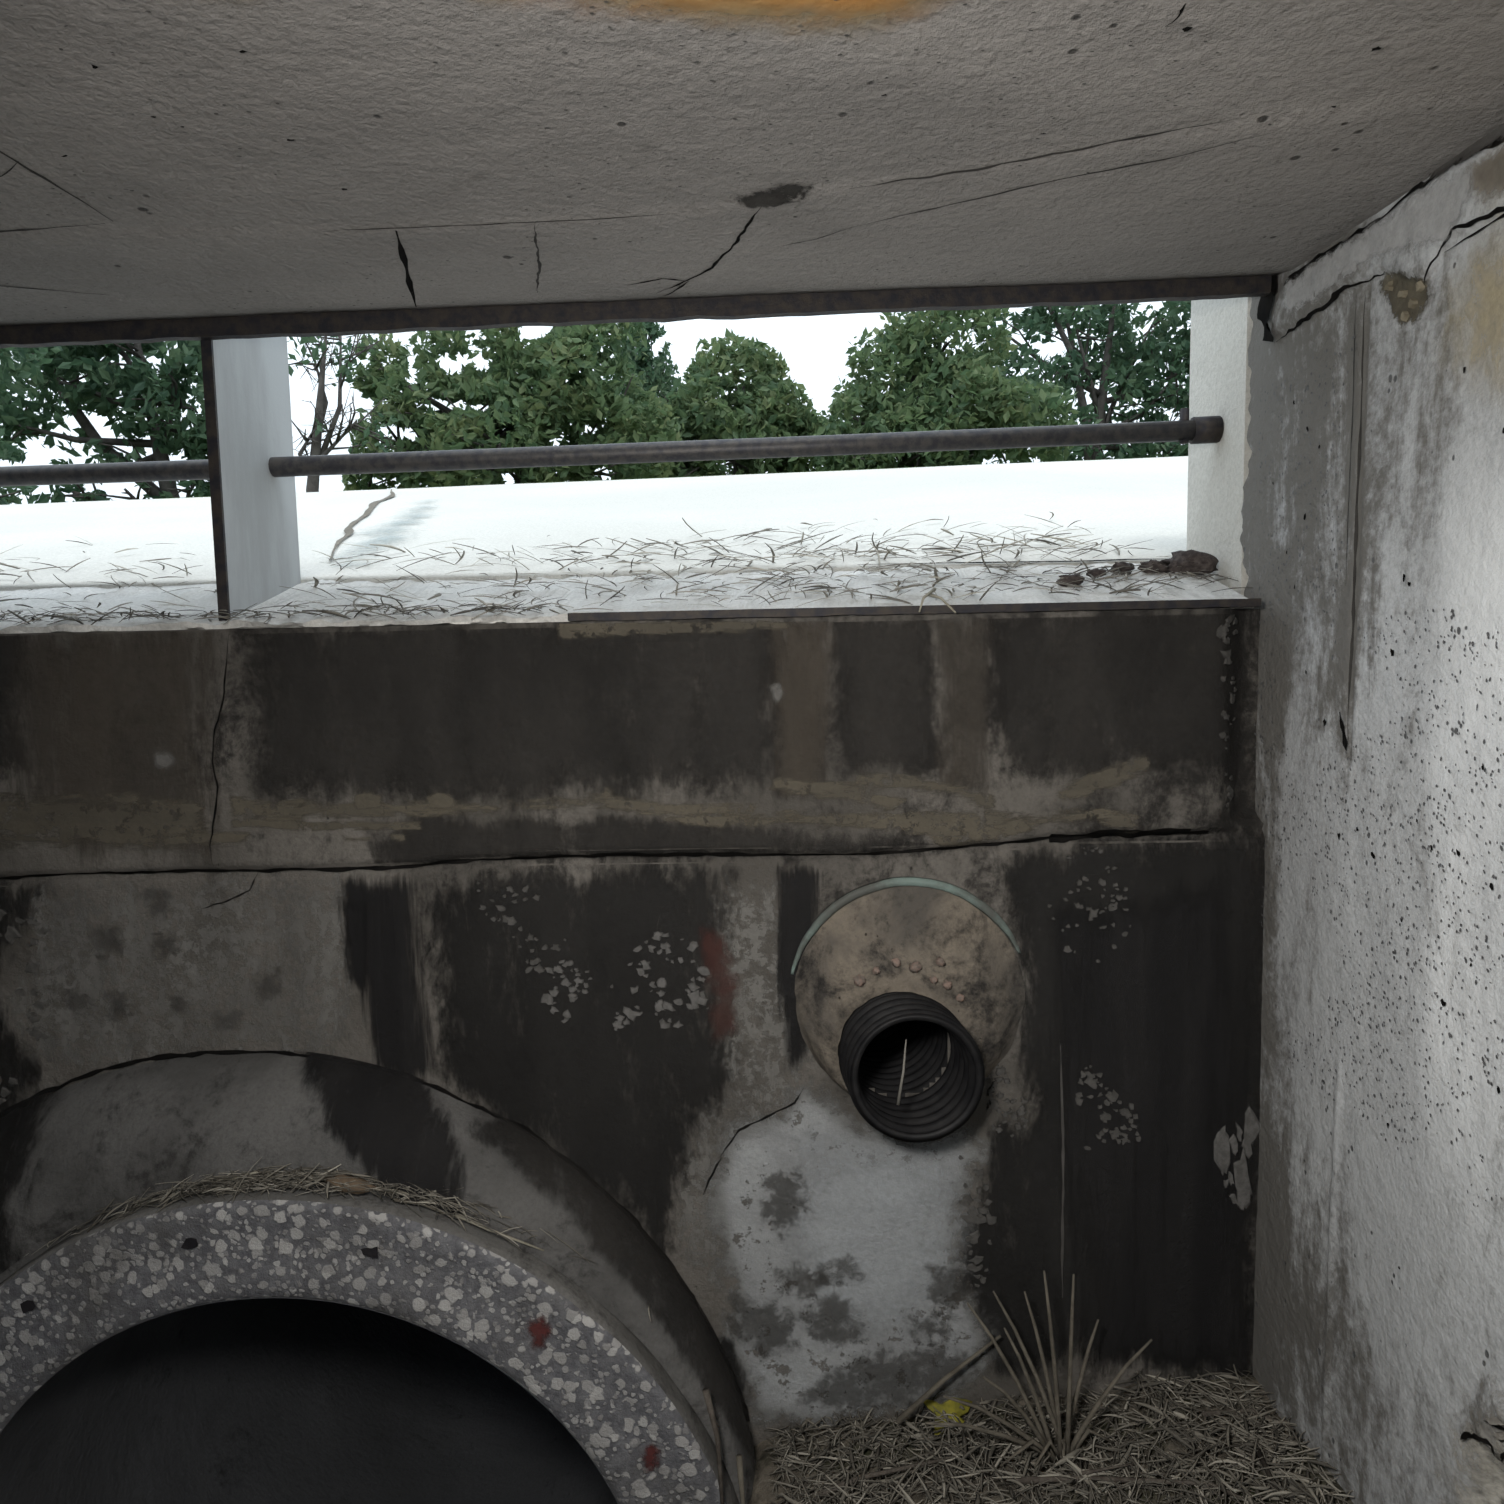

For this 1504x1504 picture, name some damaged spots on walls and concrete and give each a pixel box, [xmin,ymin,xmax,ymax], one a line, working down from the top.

rust [643,0,920,21]
crack [0,151,112,221]
crack [783,132,1274,246]
spalling [1424,123,1504,184]
leakage [1466,145,1504,203]
crack [395,231,417,307]
crack [631,206,762,296]
crack [1257,137,1504,342]
crack [0,636,1209,909]
leakage [0,614,1265,1468]